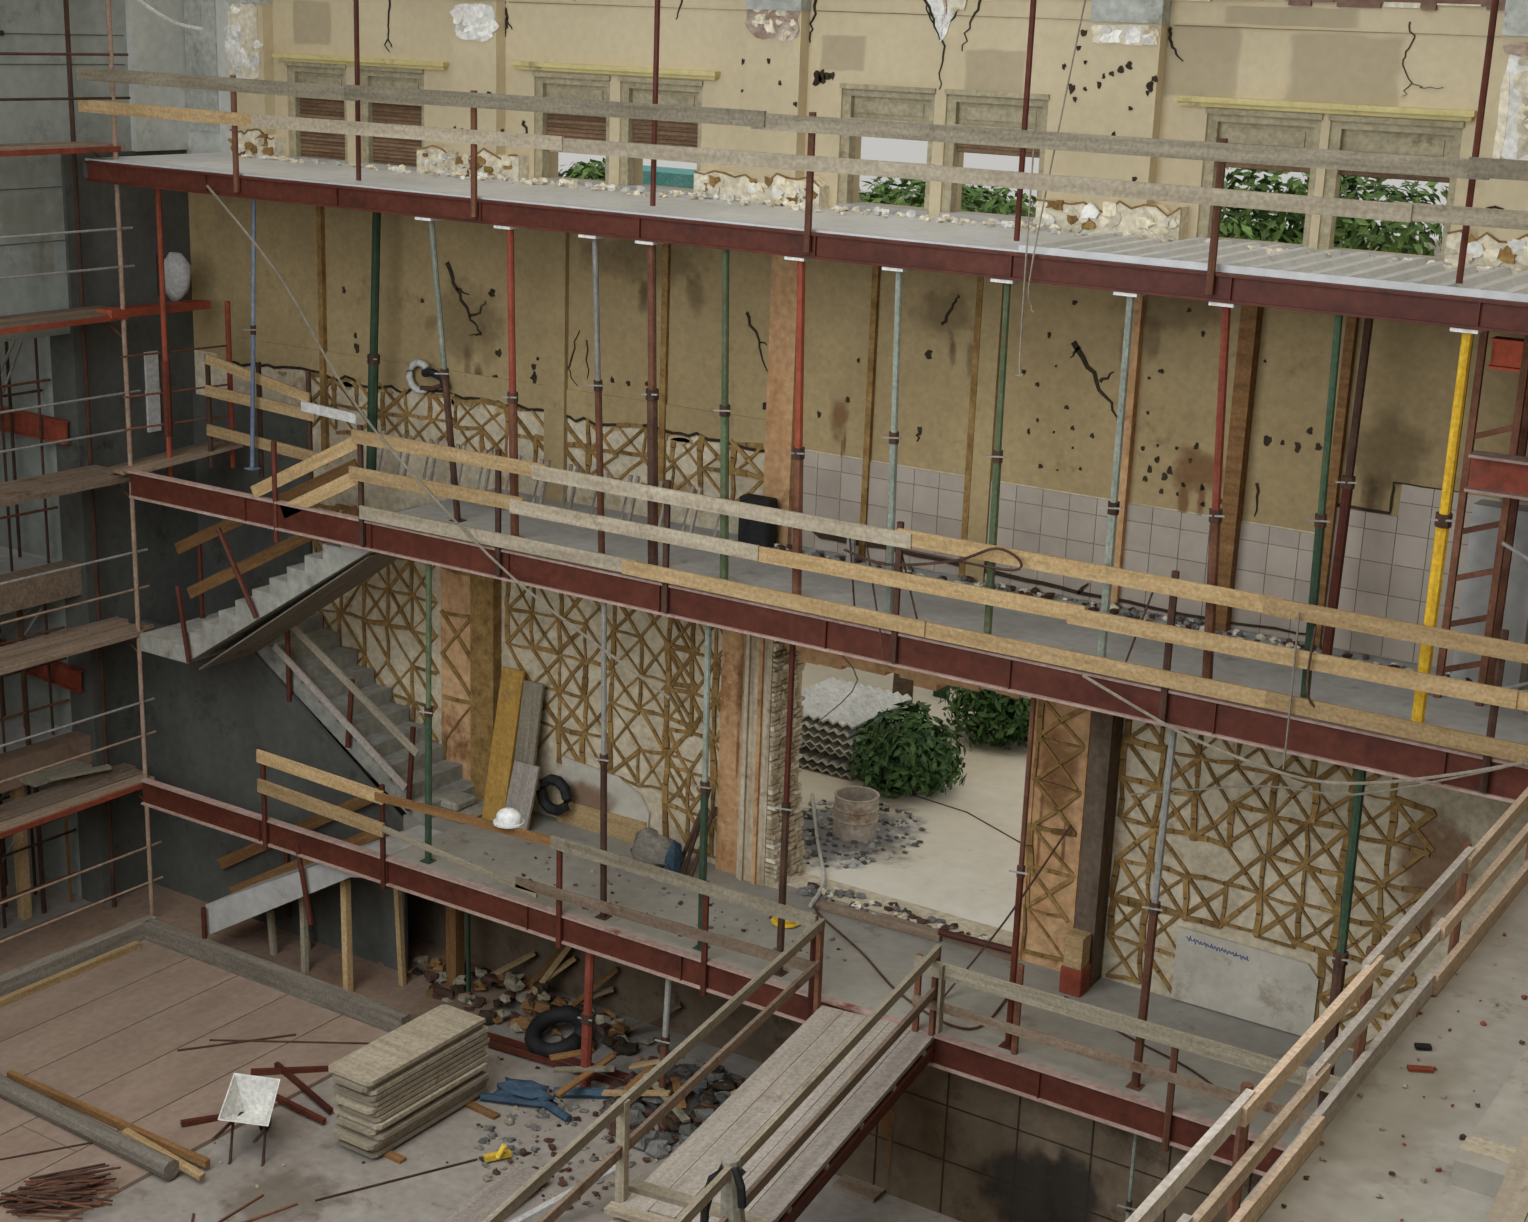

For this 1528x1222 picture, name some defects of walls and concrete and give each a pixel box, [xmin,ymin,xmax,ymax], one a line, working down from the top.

peeling [223,3,263,79]
peeling [450,3,499,42]
spalling [745,9,800,41]
crack [809,0,1077,90]
peeling [1493,42,1528,161]
spalling [693,170,829,209]
spalling [1444,229,1528,272]
crack [445,261,486,336]
crack [745,312,768,373]
crack [1070,340,1117,420]
damp [980,1152,1096,1222]